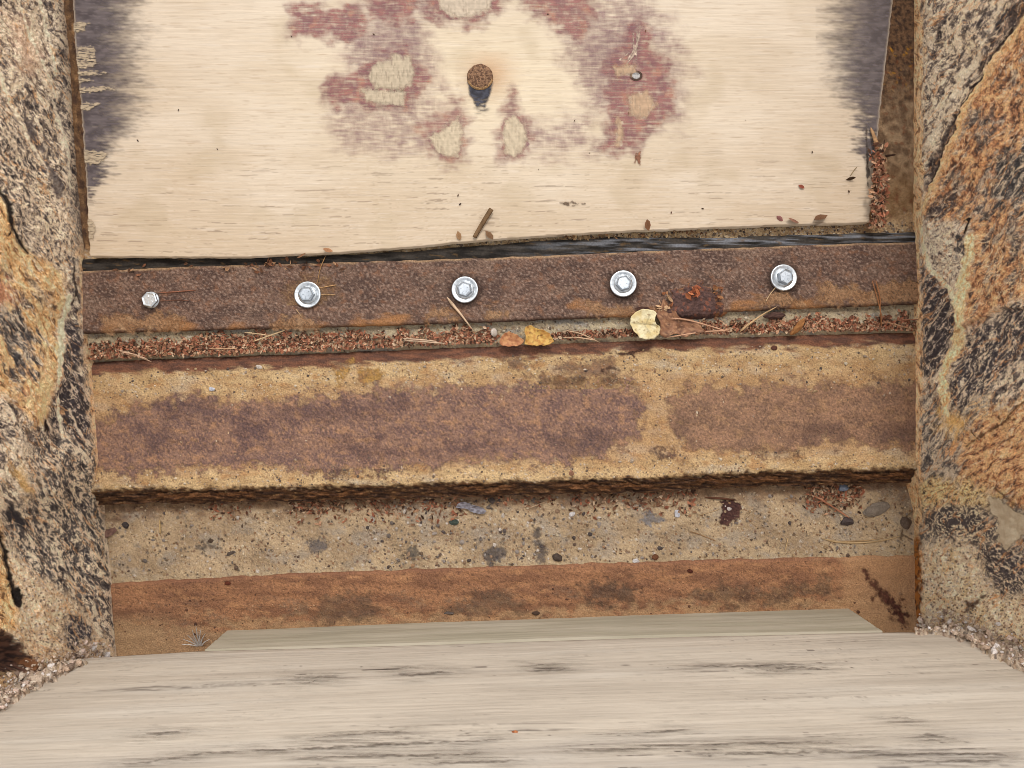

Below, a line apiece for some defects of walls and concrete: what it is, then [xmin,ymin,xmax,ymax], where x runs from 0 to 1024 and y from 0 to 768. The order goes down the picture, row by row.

damp [838,0,891,158]
damp [74,0,131,198]
damp [468,84,492,111]
corrosion [102,310,185,335]
corrosion [270,314,317,330]
corrosion [485,311,509,320]
corrosion [586,300,633,316]
corrosion [755,279,918,309]
corrosion [95,356,646,482]
corrosion [652,373,916,461]